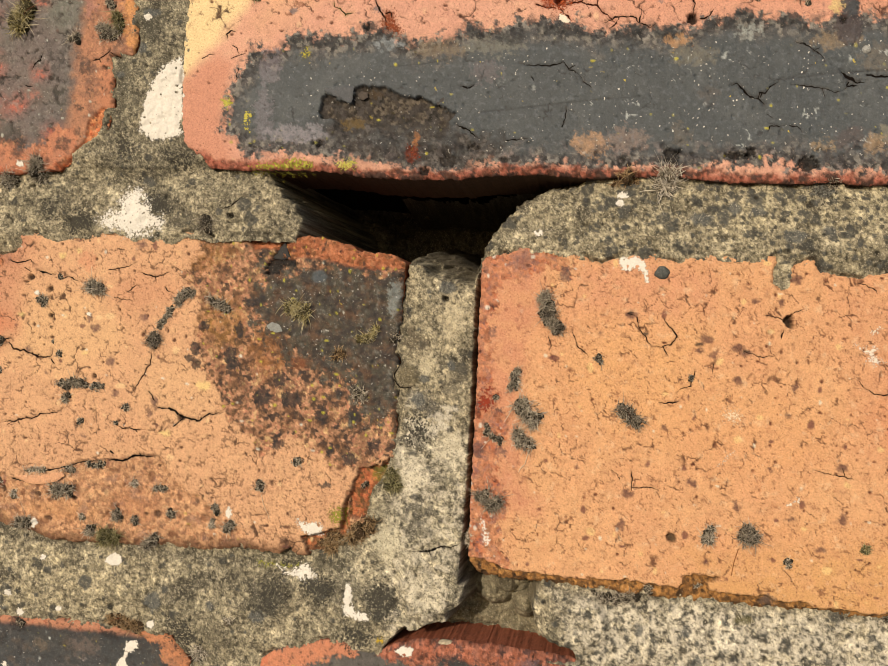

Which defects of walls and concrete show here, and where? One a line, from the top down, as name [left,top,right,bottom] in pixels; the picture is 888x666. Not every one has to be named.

crack [508,0,654,29]
spalling [319,85,456,148]
crack [524,62,591,87]
crack [731,72,888,131]
crack [0,335,55,364]
crack [5,407,64,425]
crack [12,425,153,482]
crack [134,355,223,427]
spalling [446,248,888,637]